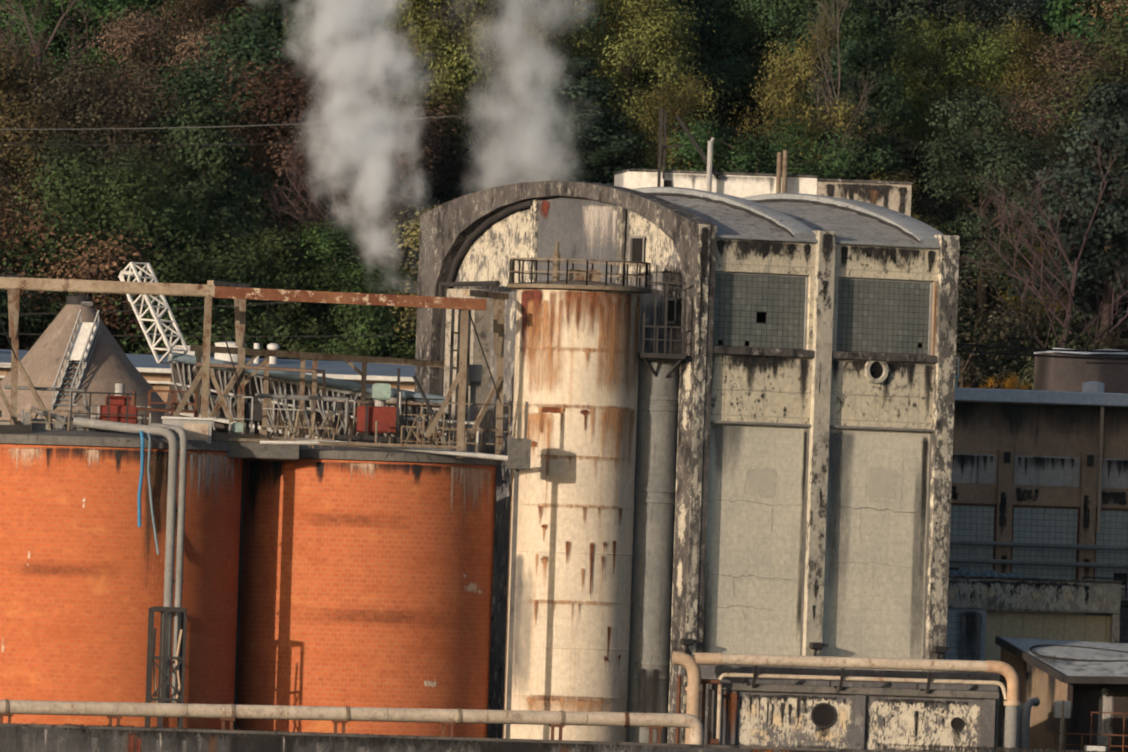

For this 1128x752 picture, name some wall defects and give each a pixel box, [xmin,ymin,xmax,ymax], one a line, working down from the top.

water stain [826,184,907,214]
peeling [462,210,531,290]
rust [521,289,640,385]
rust [524,404,635,481]
water stain [954,403,1128,430]
water stain [9,448,281,546]
spalling [677,465,698,597]
rust [534,541,616,616]
rust [604,626,621,662]
water stain [13,722,654,752]
peeling [738,697,852,749]
peeling [866,701,981,752]